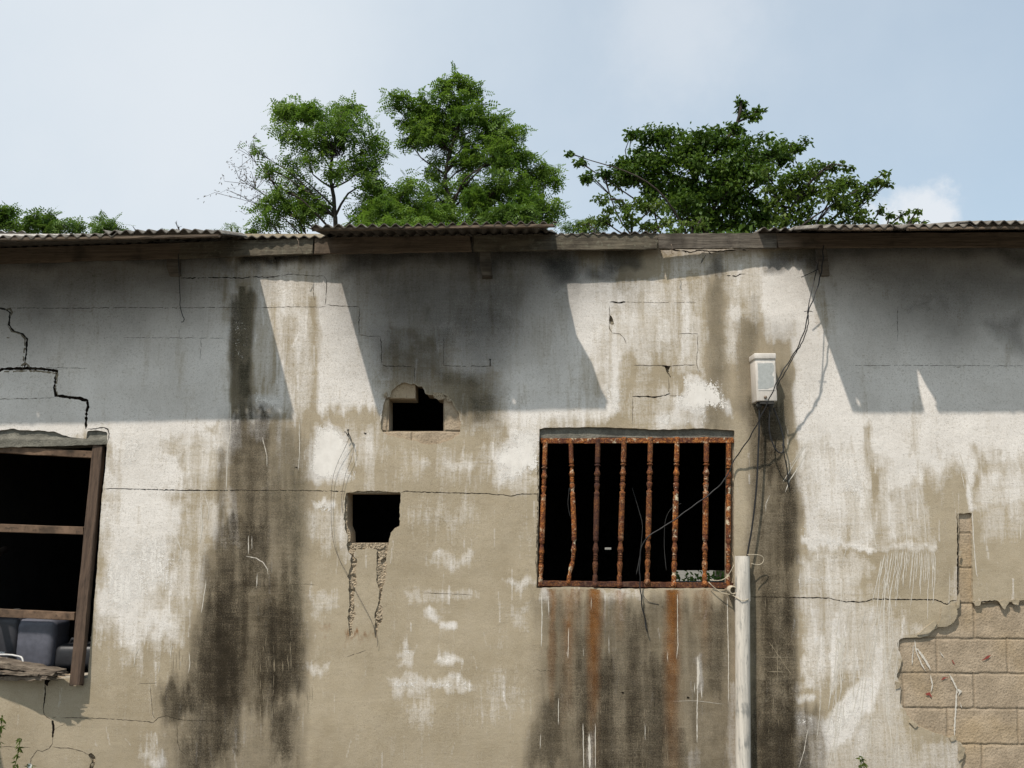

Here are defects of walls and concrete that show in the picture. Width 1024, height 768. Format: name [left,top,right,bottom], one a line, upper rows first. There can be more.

crack [0,307,235,440]
leakage [231,286,262,419]
spalling [381,383,461,444]
crack [107,486,345,494]
leakage [165,562,301,751]
spalling [314,491,400,638]
rust [667,590,678,653]
leakage [750,404,807,768]
crack [755,519,997,605]
spalling [895,513,1024,768]